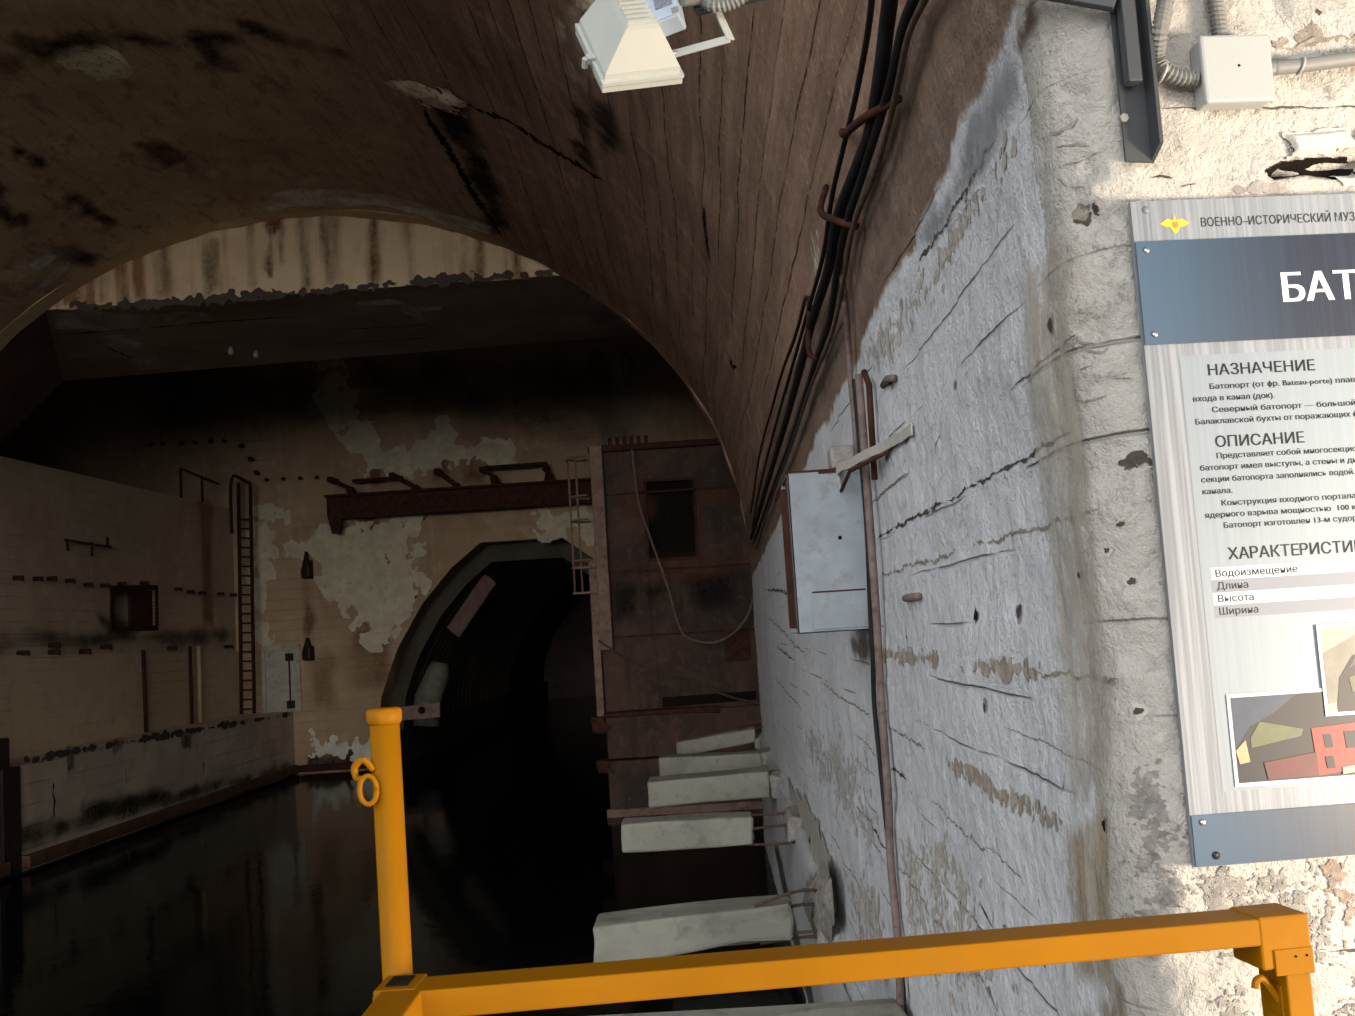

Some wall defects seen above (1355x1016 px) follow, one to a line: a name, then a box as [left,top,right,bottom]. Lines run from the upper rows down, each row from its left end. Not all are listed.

crack [424,110,502,236]
crack [468,104,605,183]
spalling [1233,127,1355,195]
rust [116,256,143,298]
peeling [311,358,527,482]
crack [872,335,1132,538]
peeling [246,503,432,653]
crack [880,508,1100,578]
damp [21,764,291,844]
damp [308,728,371,765]
peeling [802,722,885,943]
peeling [898,819,993,936]